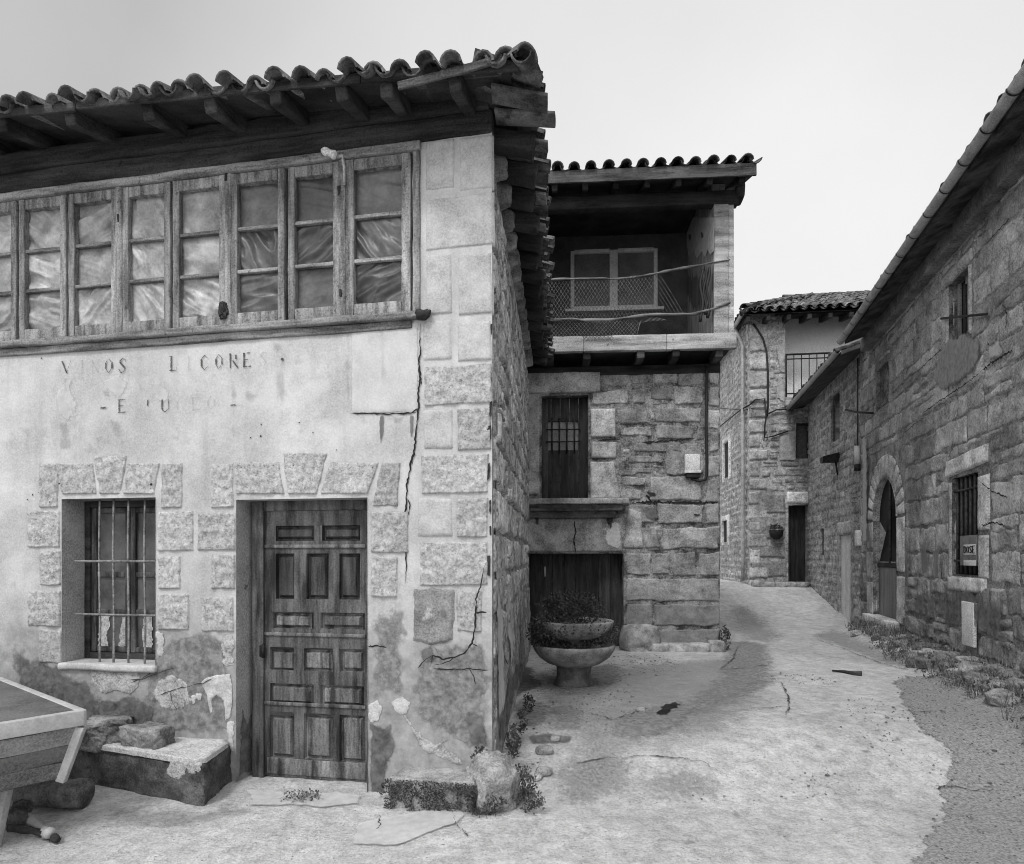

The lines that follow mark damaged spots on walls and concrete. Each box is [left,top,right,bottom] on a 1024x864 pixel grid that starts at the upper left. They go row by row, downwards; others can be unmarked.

crack [352,323,422,515]
flaking render [368,463,515,765]
crack [418,566,509,682]
water stain [13,652,102,720]
flaking render [90,631,235,751]
water stain [370,724,395,792]